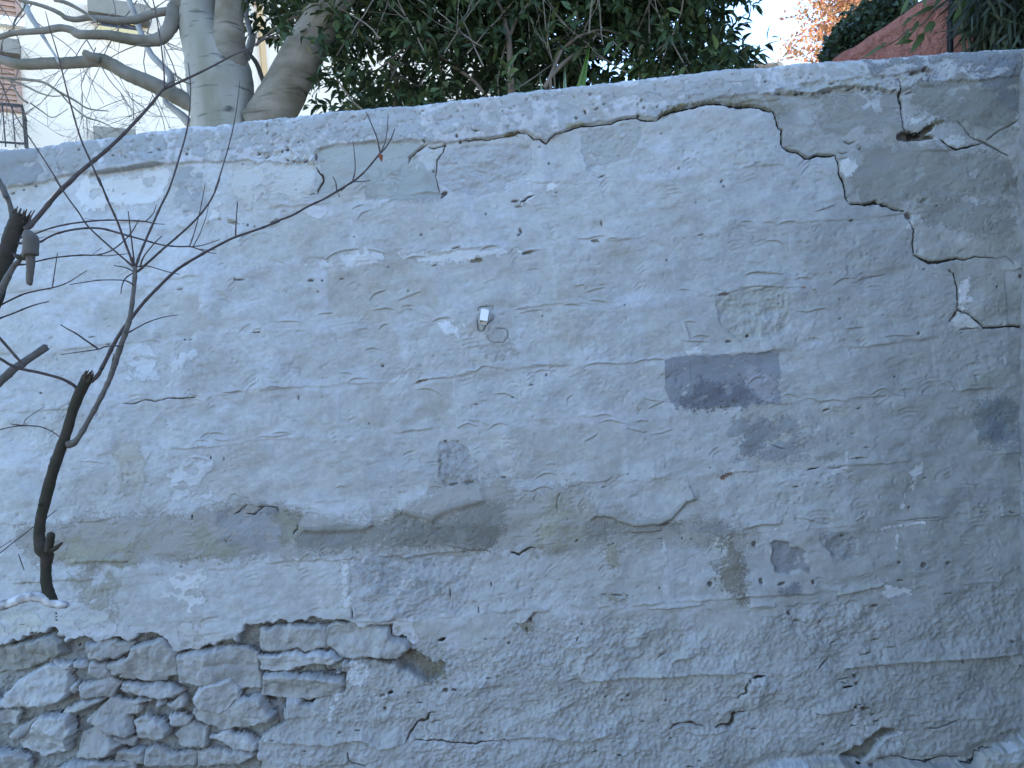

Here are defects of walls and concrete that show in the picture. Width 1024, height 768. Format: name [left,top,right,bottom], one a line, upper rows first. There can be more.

crack [897,86,905,131]
crack [408,103,1020,330]
crack [477,306,508,343]
water stain [8,437,763,626]
spalling [0,552,474,768]